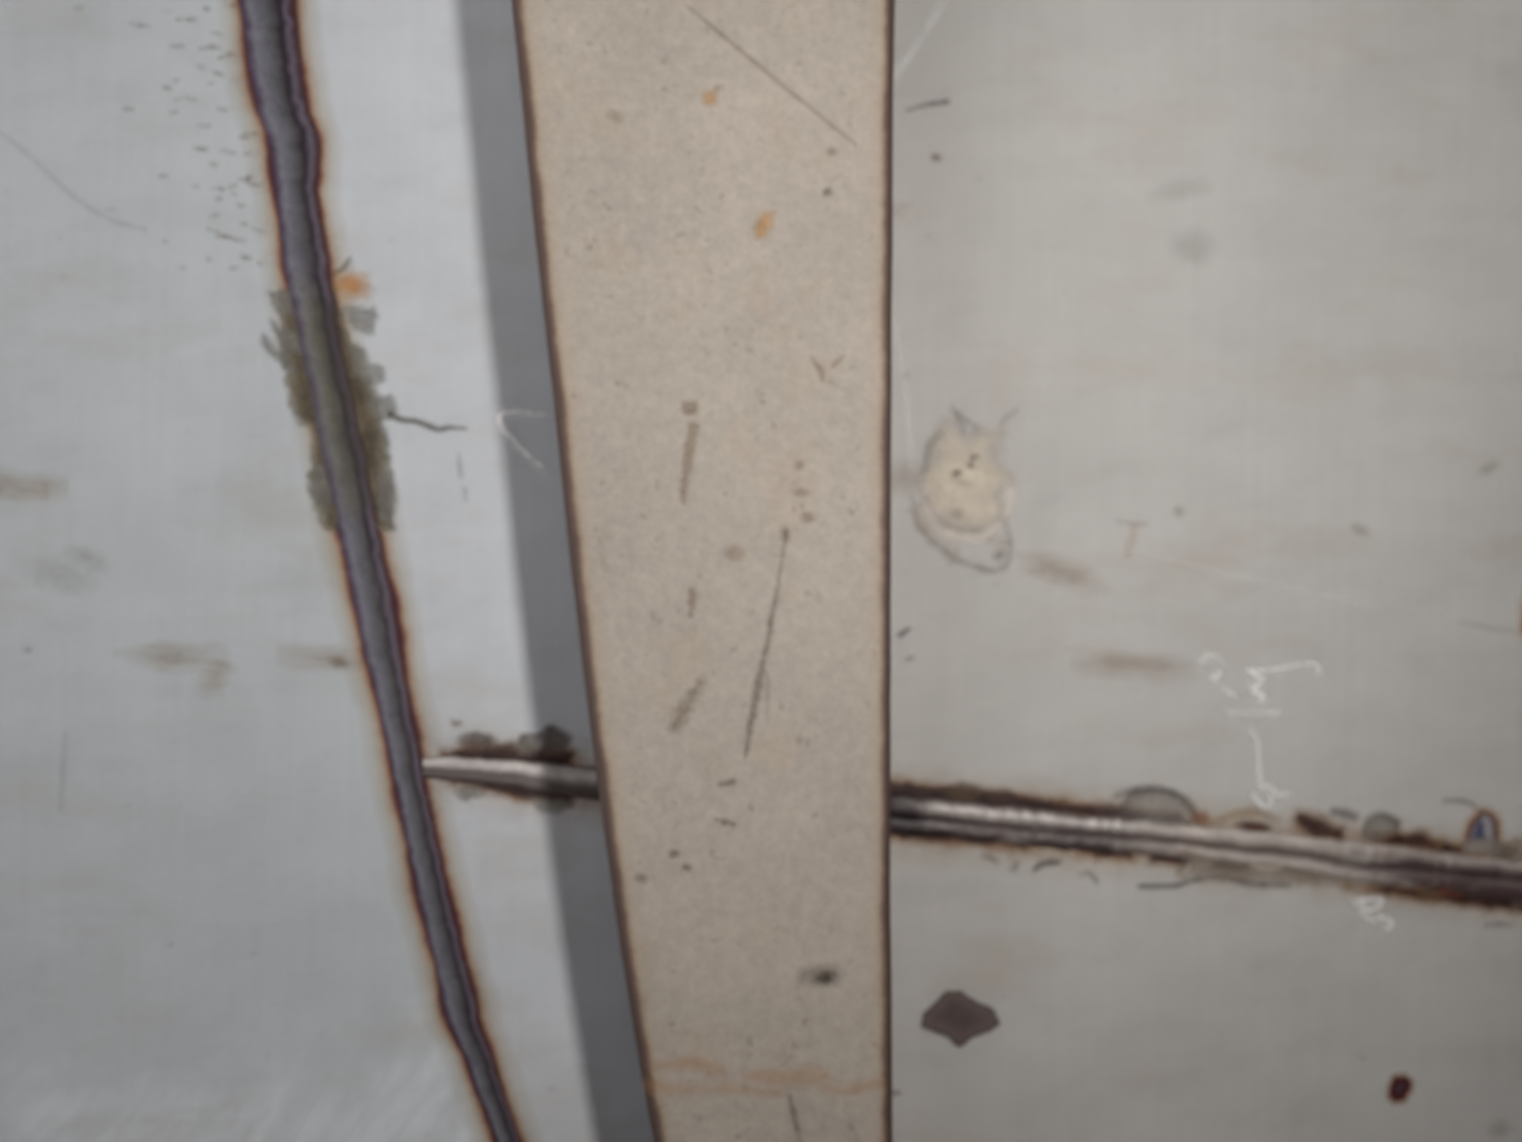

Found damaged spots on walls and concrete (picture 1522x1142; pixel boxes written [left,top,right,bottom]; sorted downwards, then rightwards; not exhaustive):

corrosion [339,276,365,295]
leakage [264,291,338,529]
leakage [333,289,395,531]